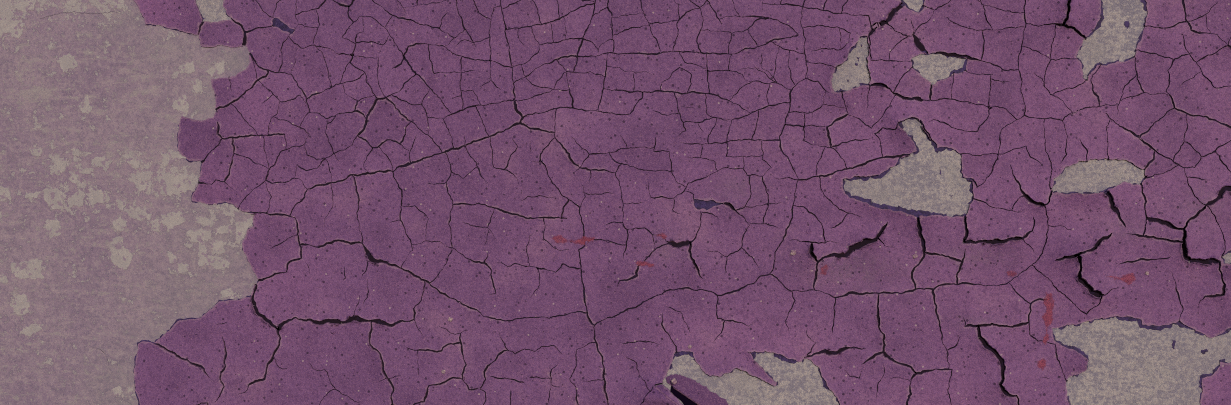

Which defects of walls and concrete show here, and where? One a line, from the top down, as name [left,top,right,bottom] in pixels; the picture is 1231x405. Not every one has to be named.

peeling [0,0,318,405]
crack [198,0,1151,405]
peeling [801,0,1231,264]
crack [1106,34,1231,301]
crack [1144,0,1219,37]
crack [156,341,227,405]
peeling [641,351,840,405]
peeling [979,316,1231,405]